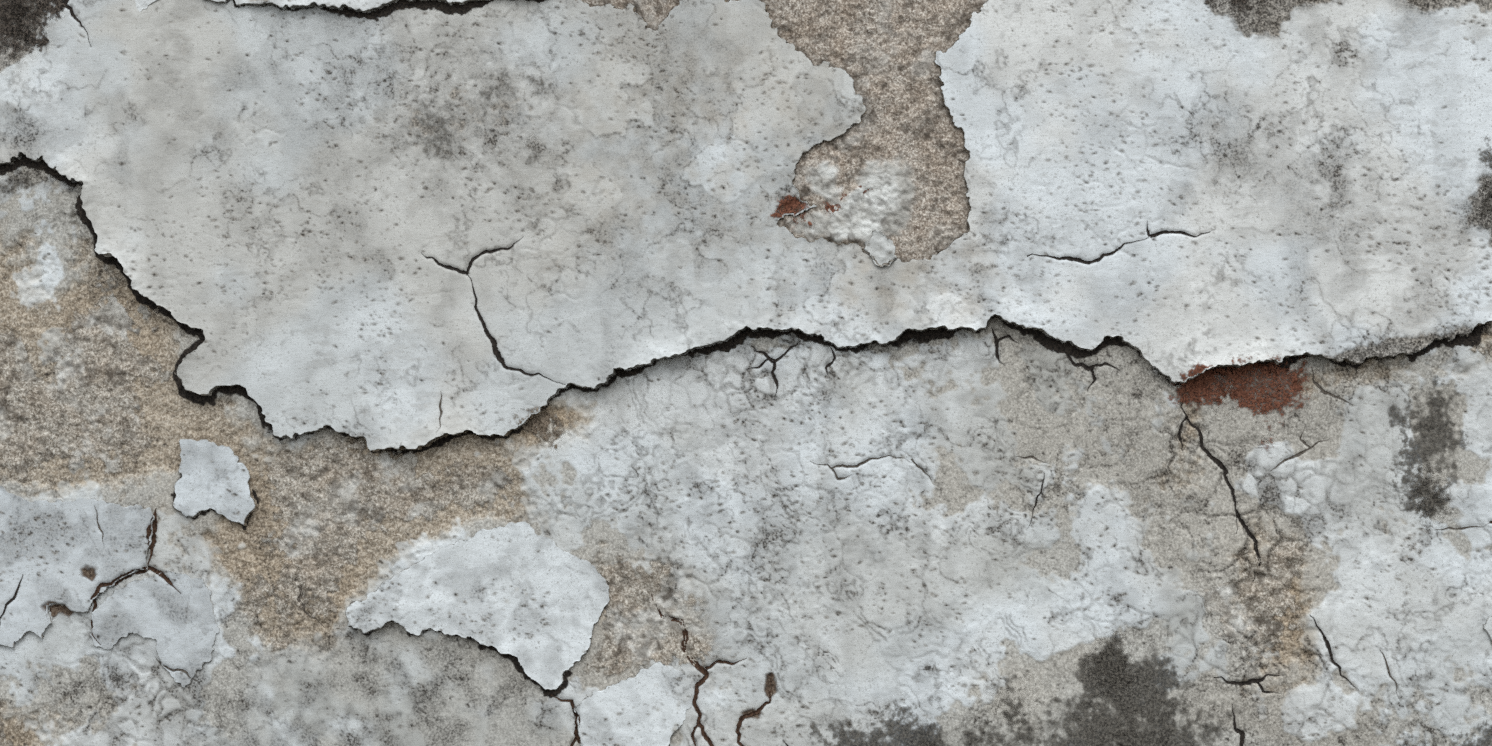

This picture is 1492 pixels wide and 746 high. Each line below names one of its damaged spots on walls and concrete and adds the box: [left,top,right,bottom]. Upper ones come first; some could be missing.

leakage [0,0,66,56]
crack [215,0,545,21]
peeling [0,0,1492,482]
corrosion [770,186,869,226]
crack [0,154,1492,582]
corrosion [1168,356,1310,449]
peeling [173,439,256,525]
crack [90,474,259,645]
spalling [244,438,514,652]
crack [651,592,772,746]
leakage [773,704,945,746]
leakage [964,631,1241,746]